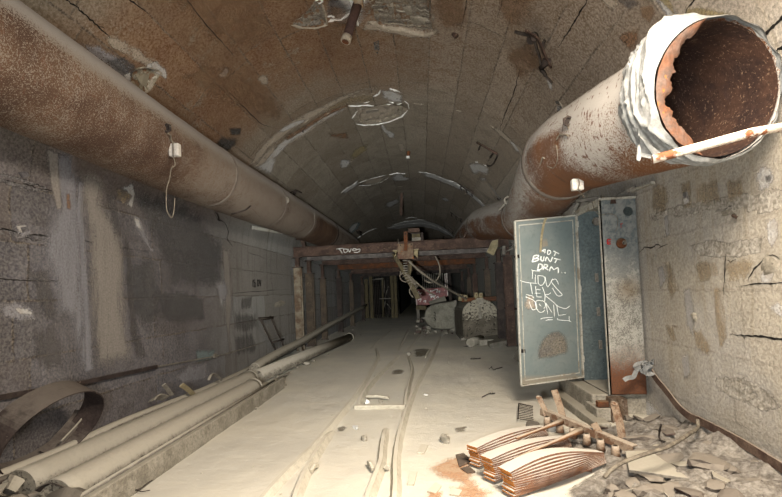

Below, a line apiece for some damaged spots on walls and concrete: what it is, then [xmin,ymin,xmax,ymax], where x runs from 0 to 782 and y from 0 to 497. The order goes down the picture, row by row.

crack [66,0,110,38]
spalling [291,1,328,29]
spalling [367,0,436,37]
crack [558,0,587,48]
spalling [350,101,409,126]
crack [0,228,51,238]
damp [29,150,255,372]
crack [723,254,782,295]
crack [734,333,782,341]